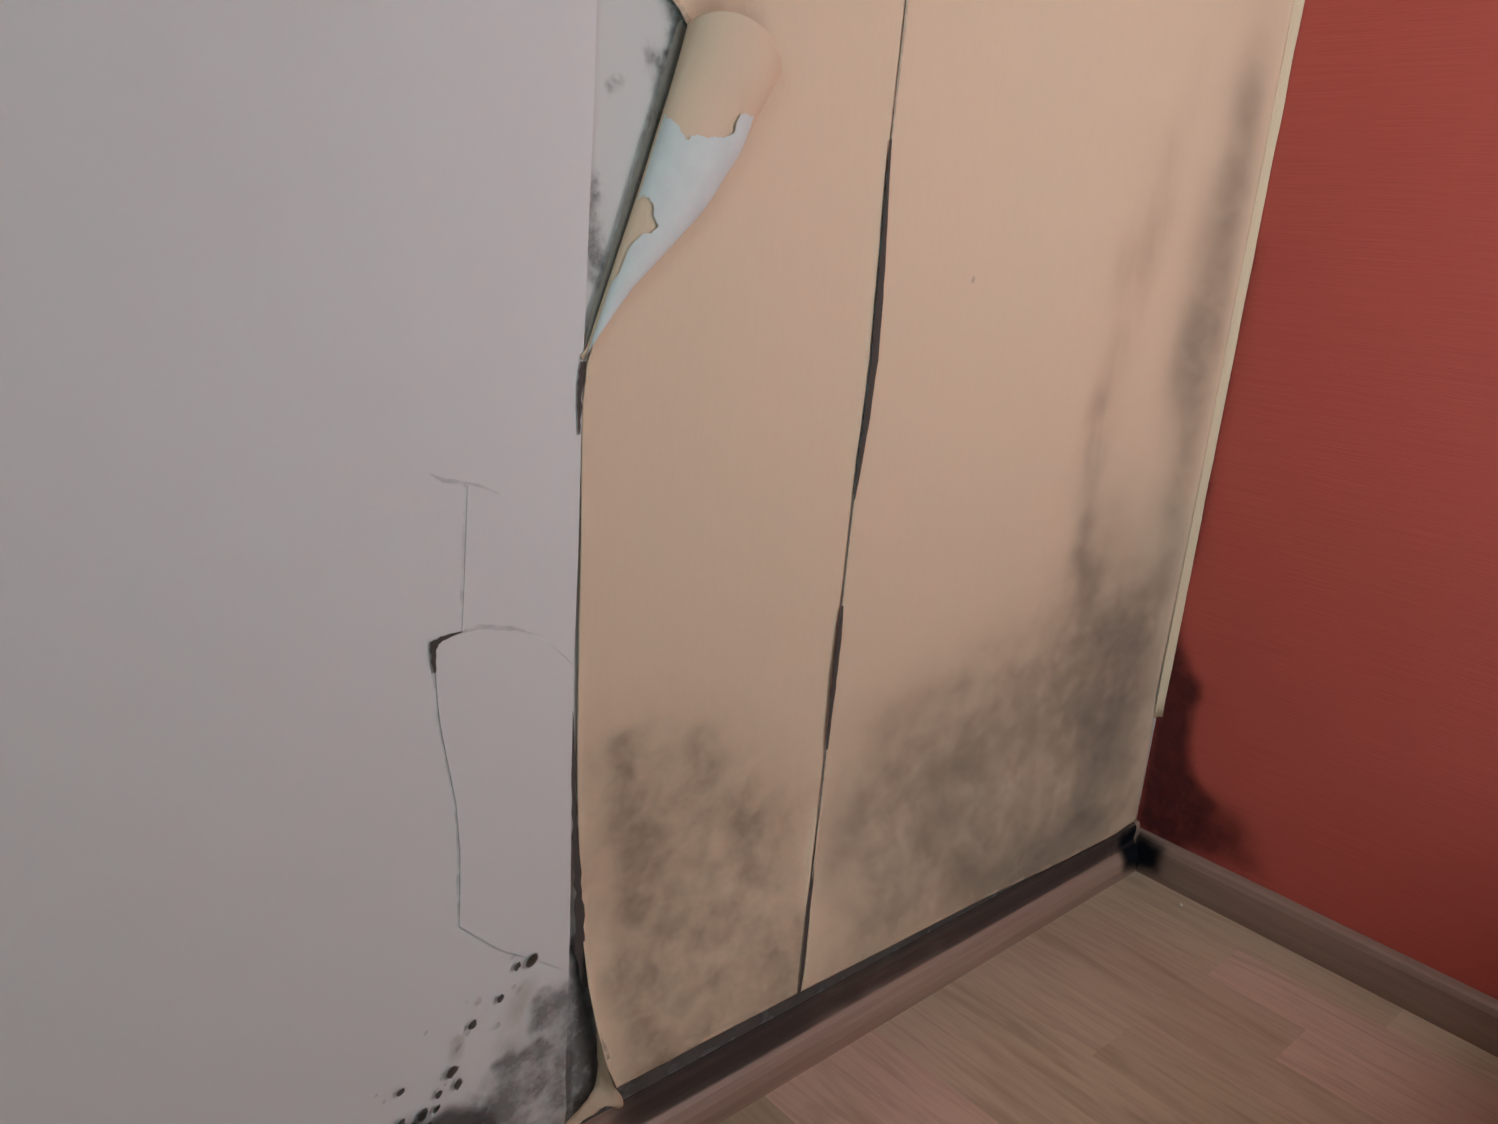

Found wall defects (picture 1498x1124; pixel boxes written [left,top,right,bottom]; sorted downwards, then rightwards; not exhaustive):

leakage [588,230,603,268]
crack [854,139,892,500]
crack [826,606,843,750]
crack [799,850,816,992]
leakage [399,643,1237,1124]